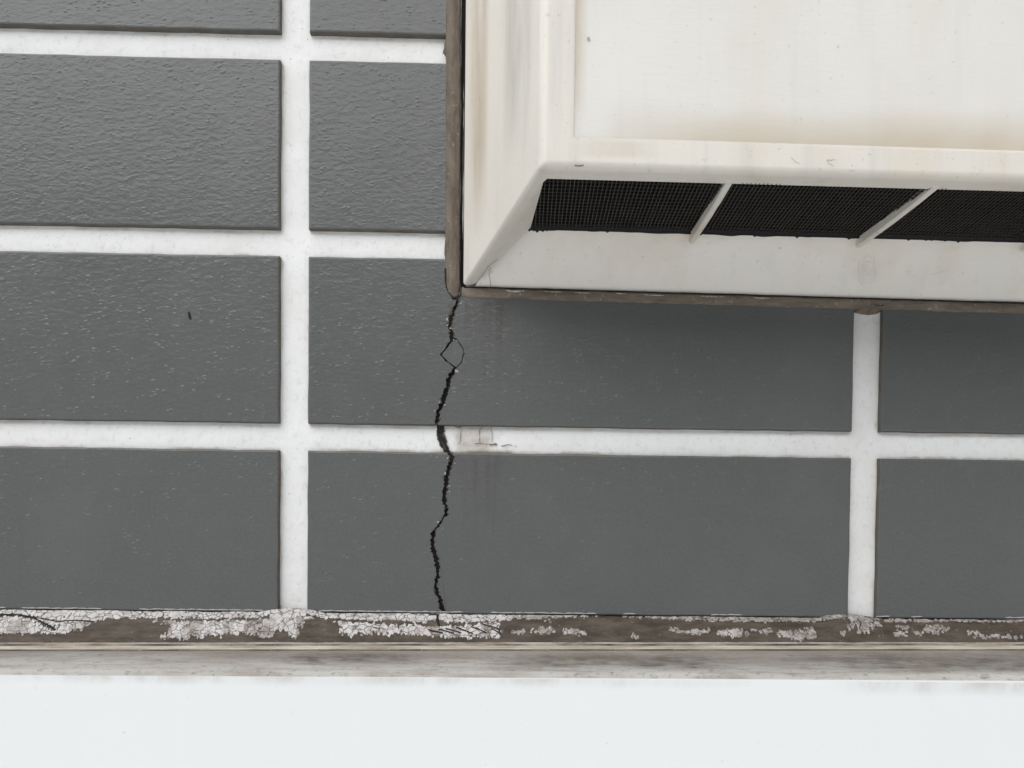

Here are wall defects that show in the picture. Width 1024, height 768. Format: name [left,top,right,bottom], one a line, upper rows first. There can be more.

crack [428,301,516,634]
peeling [0,607,601,641]
peeling [621,613,1024,642]